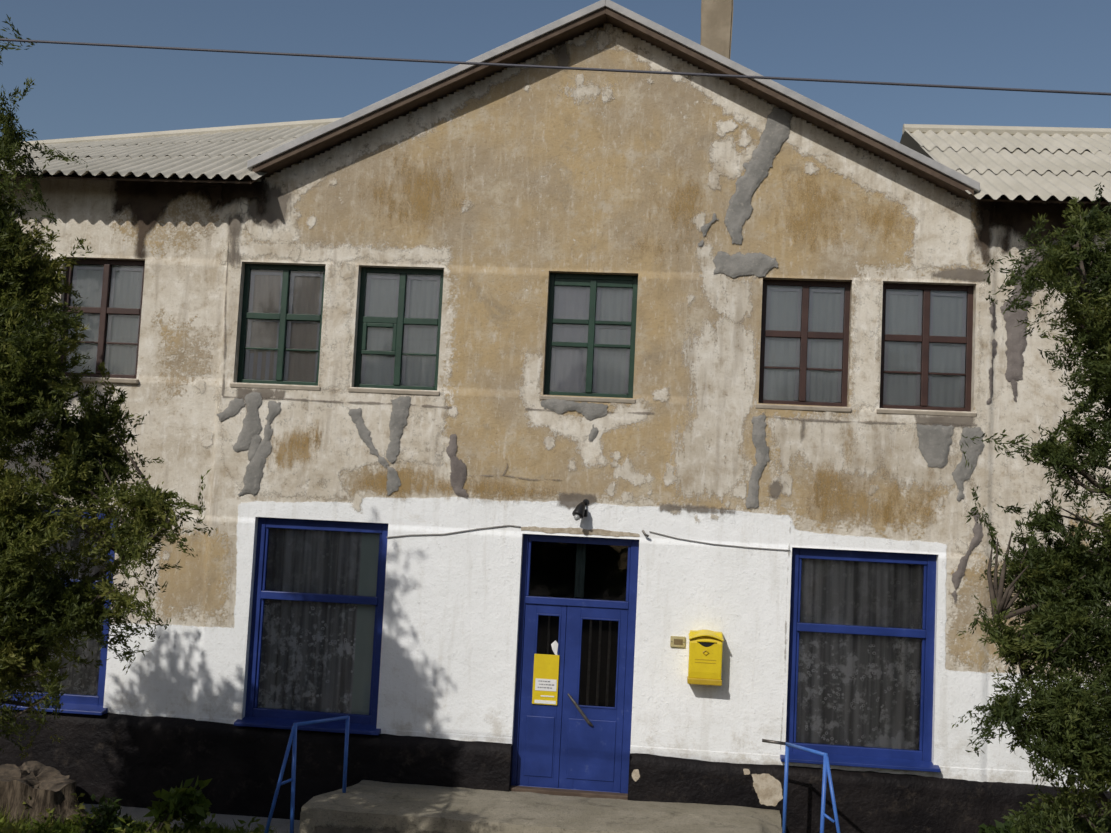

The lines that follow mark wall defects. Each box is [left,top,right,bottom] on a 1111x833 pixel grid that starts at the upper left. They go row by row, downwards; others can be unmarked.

damp [113,179,291,263]
peeling [194,24,776,521]
peeling [765,116,1078,567]
flaking render [743,769,783,806]